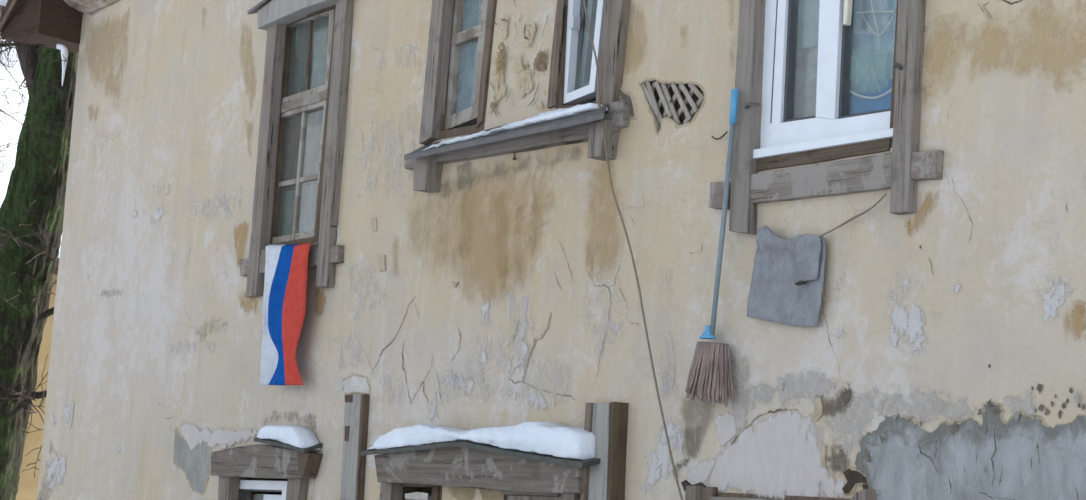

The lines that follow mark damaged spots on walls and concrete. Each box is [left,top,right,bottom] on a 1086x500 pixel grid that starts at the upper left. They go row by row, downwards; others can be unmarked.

crack [978,0,1022,20]
crack [373,223,639,408]
peeling [884,268,940,356]
flaking render [173,423,258,495]
peeling [642,416,684,494]
flaking render [681,383,1086,500]